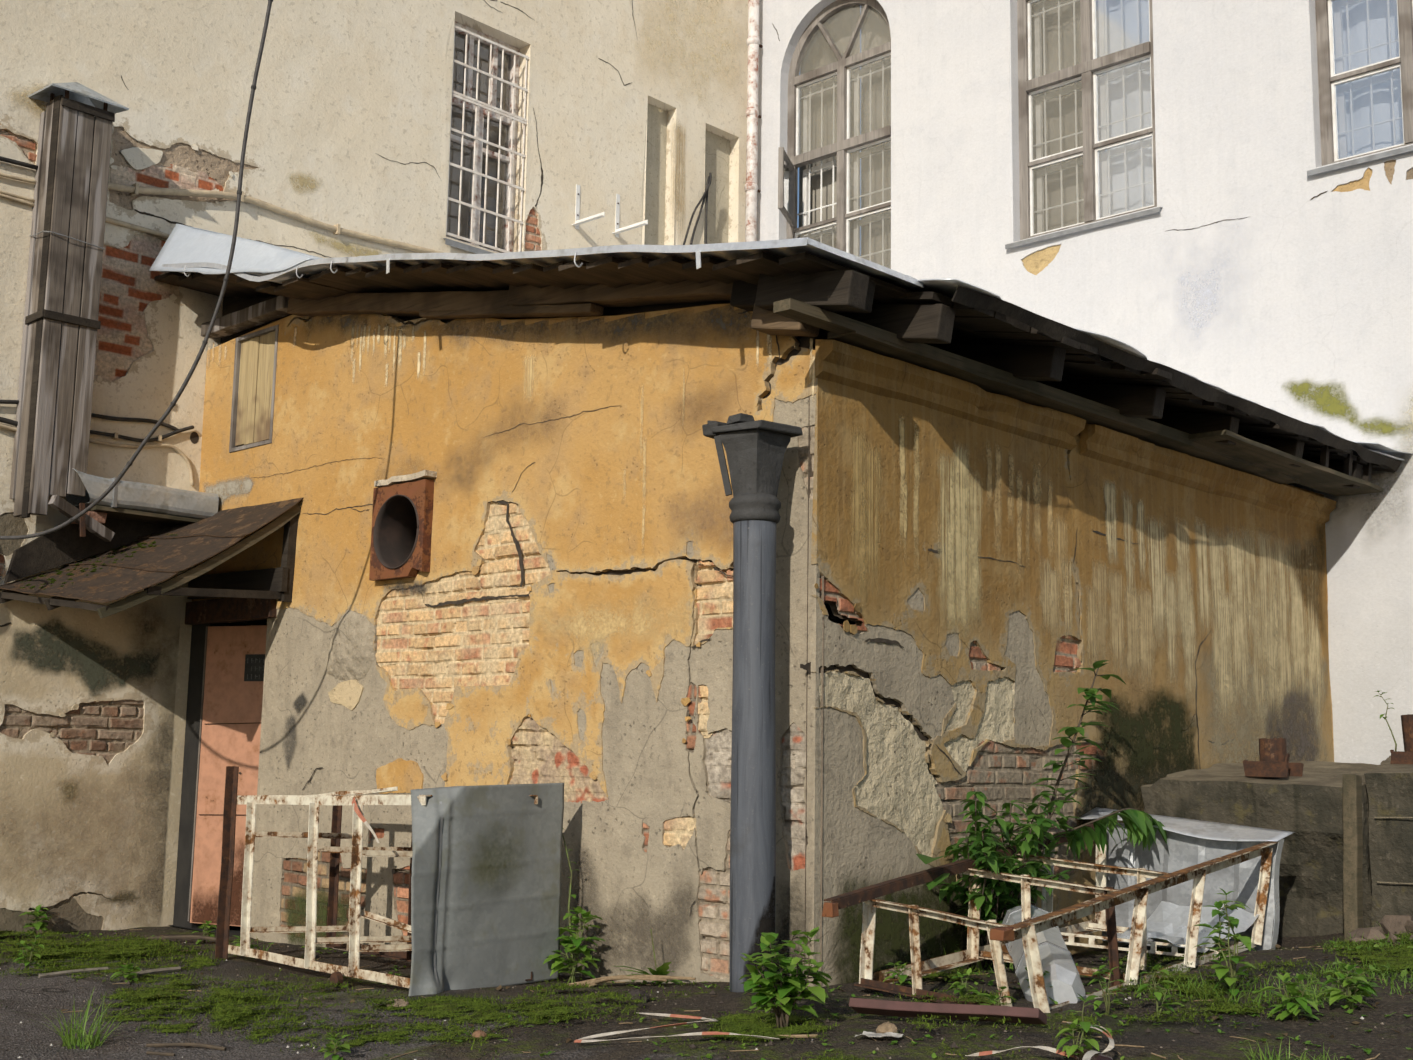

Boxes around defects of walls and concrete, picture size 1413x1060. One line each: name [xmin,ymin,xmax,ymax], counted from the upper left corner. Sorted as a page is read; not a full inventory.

peeling [109,127,257,210]
flaking render [94,234,180,382]
crack [763,335,815,399]
crack [561,557,733,587]
leakage [852,435,880,580]
leakage [899,421,919,544]
leakage [940,447,1326,763]
flaking render [0,699,144,765]
peeling [250,501,556,952]
peeling [507,541,733,983]
peeling [773,394,1106,988]
leakage [1077,750,1198,827]